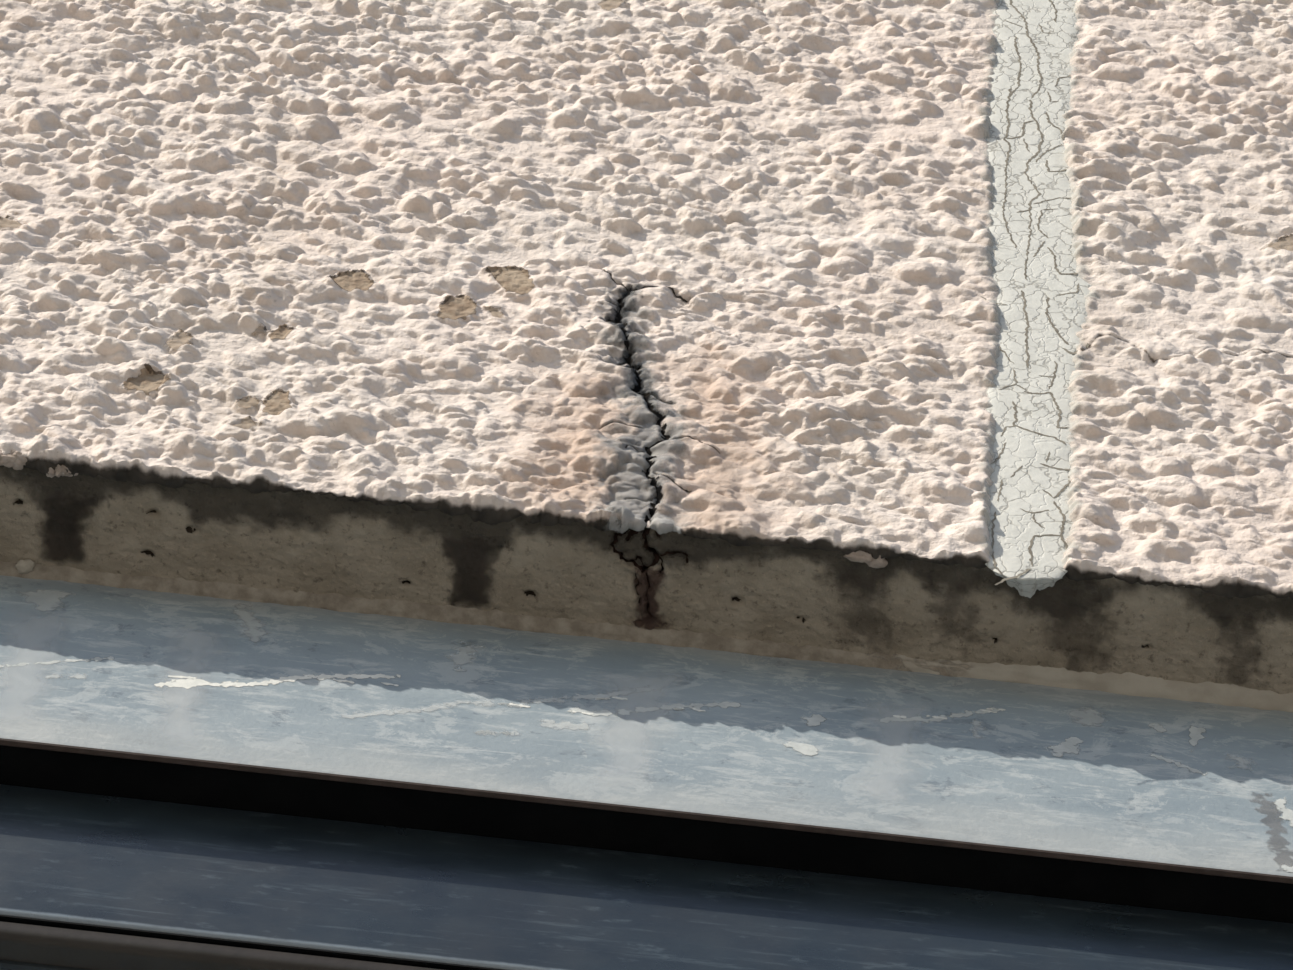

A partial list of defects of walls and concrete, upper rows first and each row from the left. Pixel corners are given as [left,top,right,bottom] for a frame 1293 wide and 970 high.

peeling [1268,233,1293,251]
peeling [329,269,374,291]
peeling [437,294,504,320]
peeling [485,265,535,295]
crack [981,0,1289,585]
peeling [252,323,294,339]
peeling [123,363,171,395]
peeling [233,389,292,429]
spalling [0,449,27,470]
spalling [46,464,78,478]
water stain [0,285,1293,622]
crack [600,269,720,617]